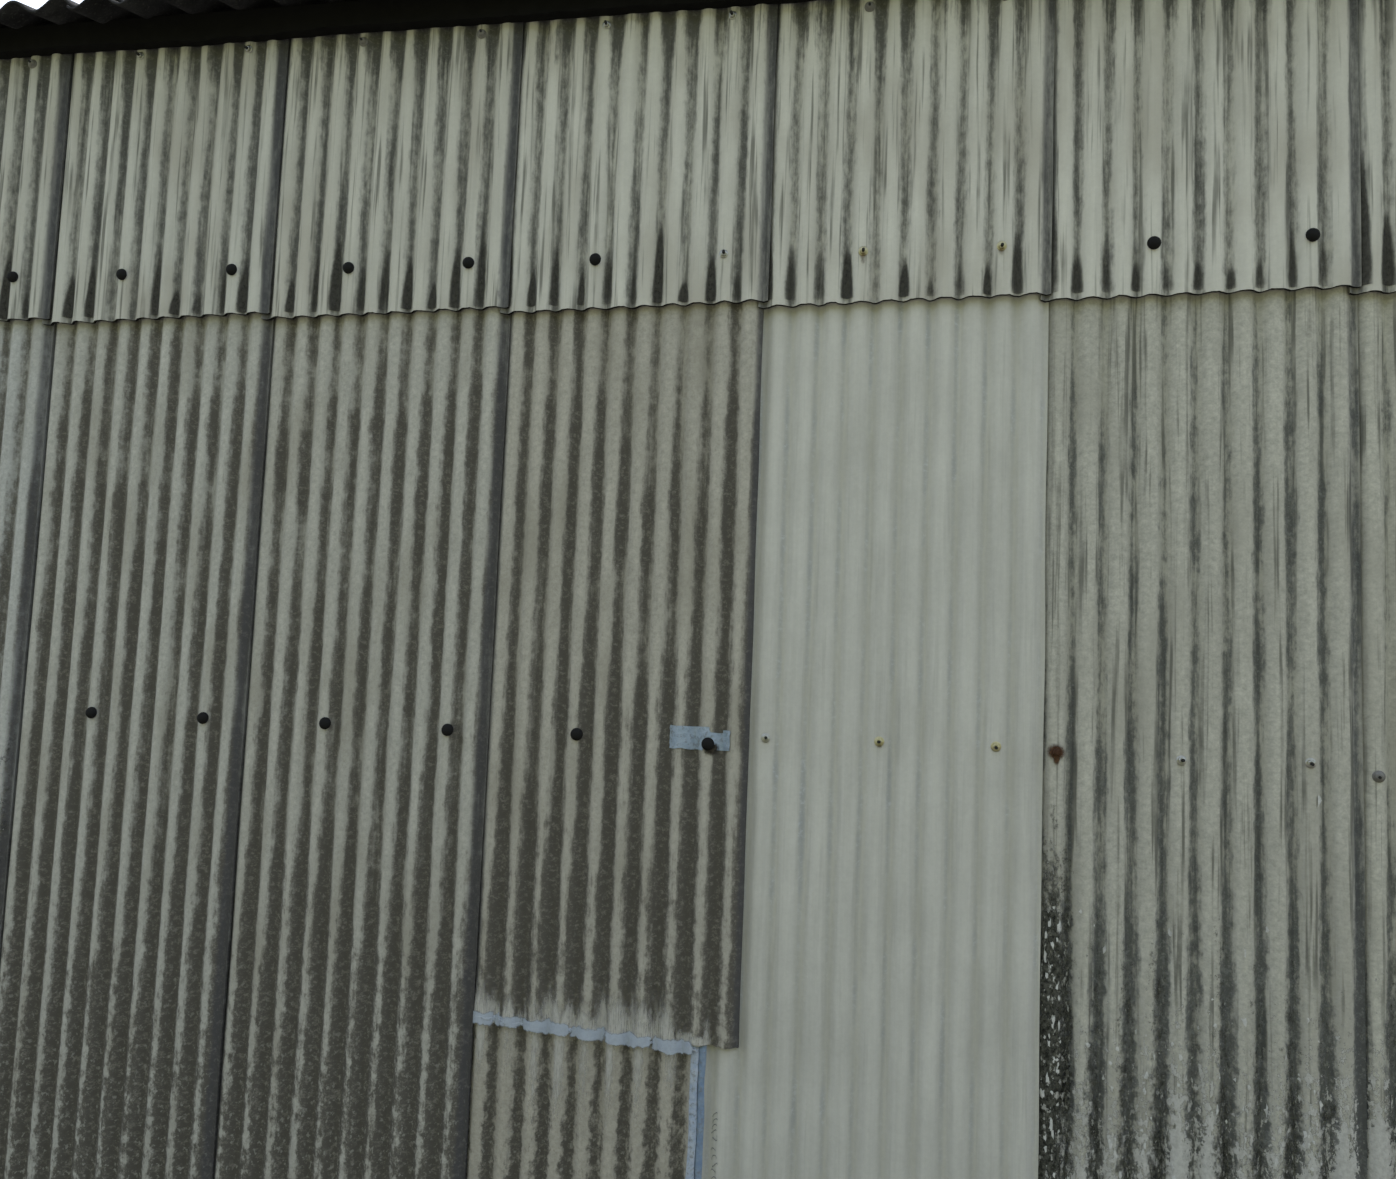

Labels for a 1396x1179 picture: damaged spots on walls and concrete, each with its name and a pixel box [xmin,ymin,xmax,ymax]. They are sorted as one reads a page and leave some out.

rust [1047,745,1064,764]
damp [1057,858,1101,1179]
damp [1116,1041,1132,1179]
damp [1148,980,1168,1179]
damp [1213,1048,1263,1179]
damp [1281,1042,1302,1179]